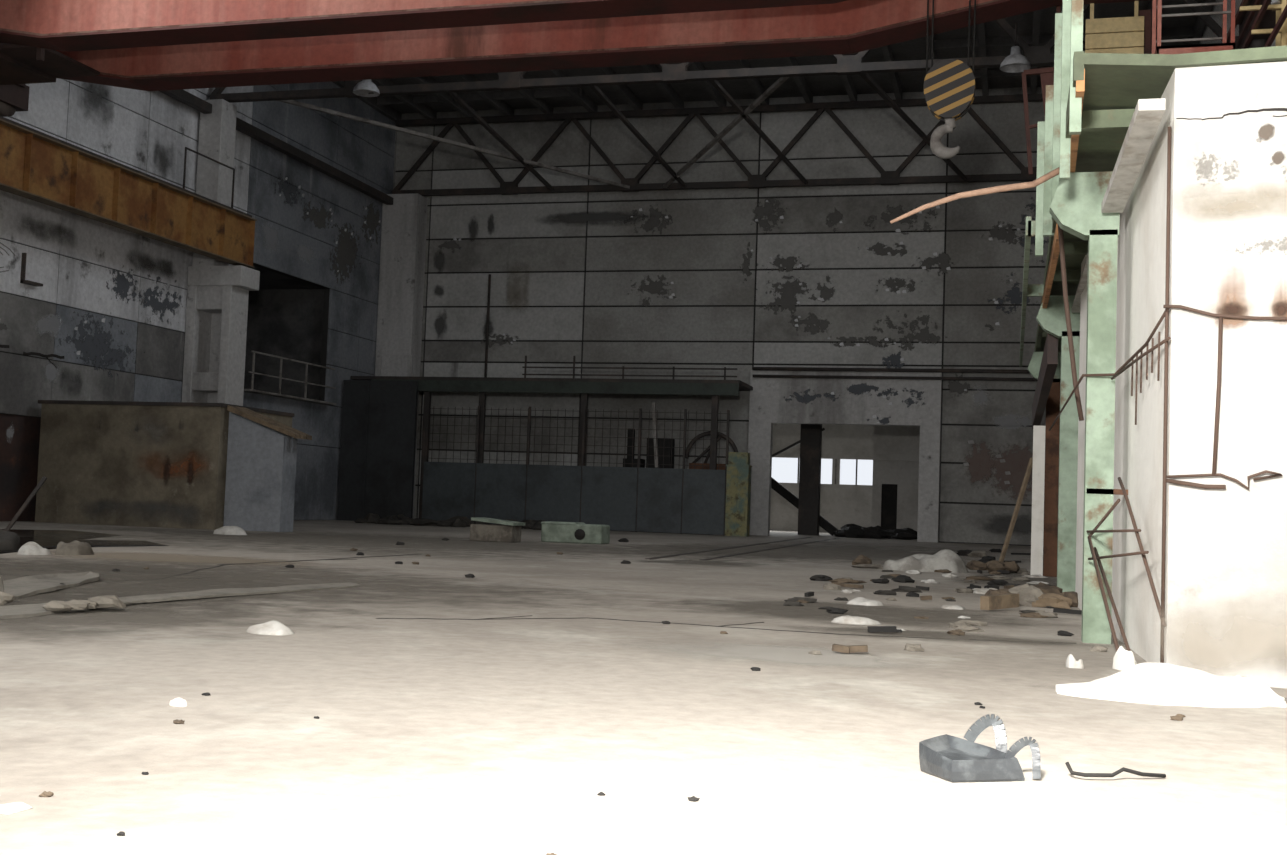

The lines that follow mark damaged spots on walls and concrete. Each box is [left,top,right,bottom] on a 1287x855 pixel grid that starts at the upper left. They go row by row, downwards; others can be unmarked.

crack [1176,108,1287,120]
peeling [742,197,954,368]
rust [1220,287,1245,326]
rust [1274,294,1287,322]
peeling [784,383,924,425]